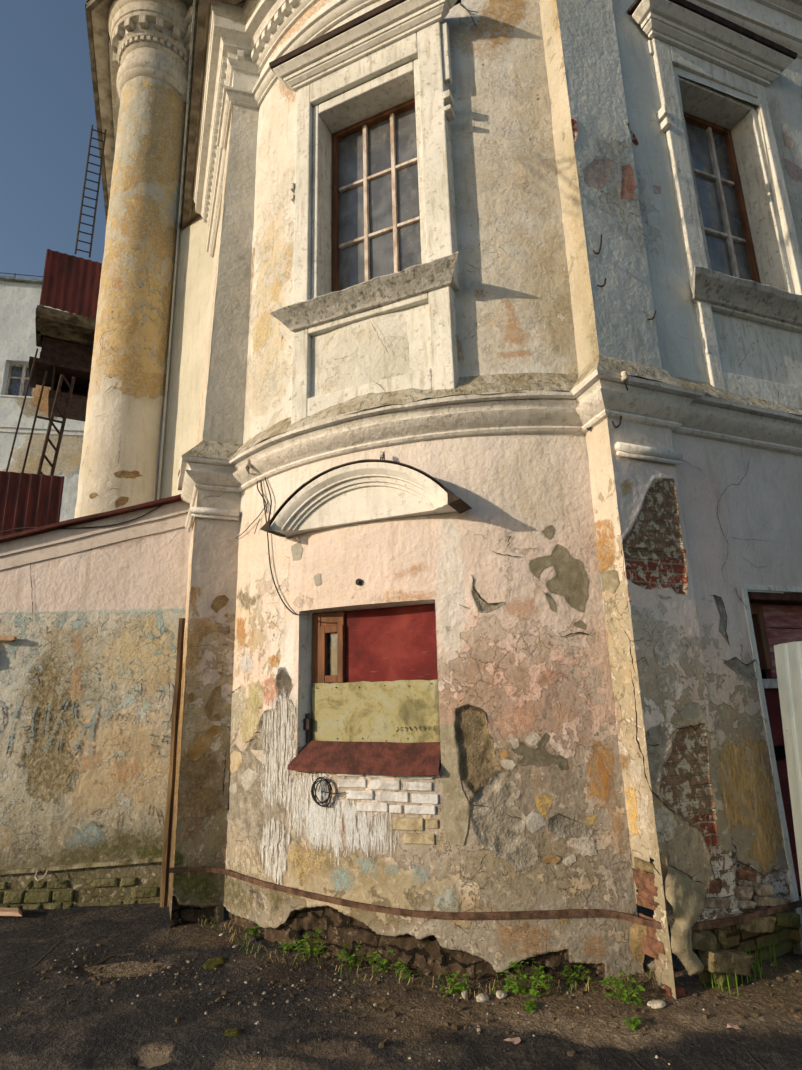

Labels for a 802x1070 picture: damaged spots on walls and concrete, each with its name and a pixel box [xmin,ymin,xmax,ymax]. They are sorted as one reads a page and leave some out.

peeling [583,159,636,199]
flaking render [529,478,688,698]
flaking render [227,670,299,884]
flaking render [170,896,605,981]
flaking render [454,705,598,872]
crack [623,629,704,823]
crack [650,853,704,884]
flaking render [614,703,793,922]